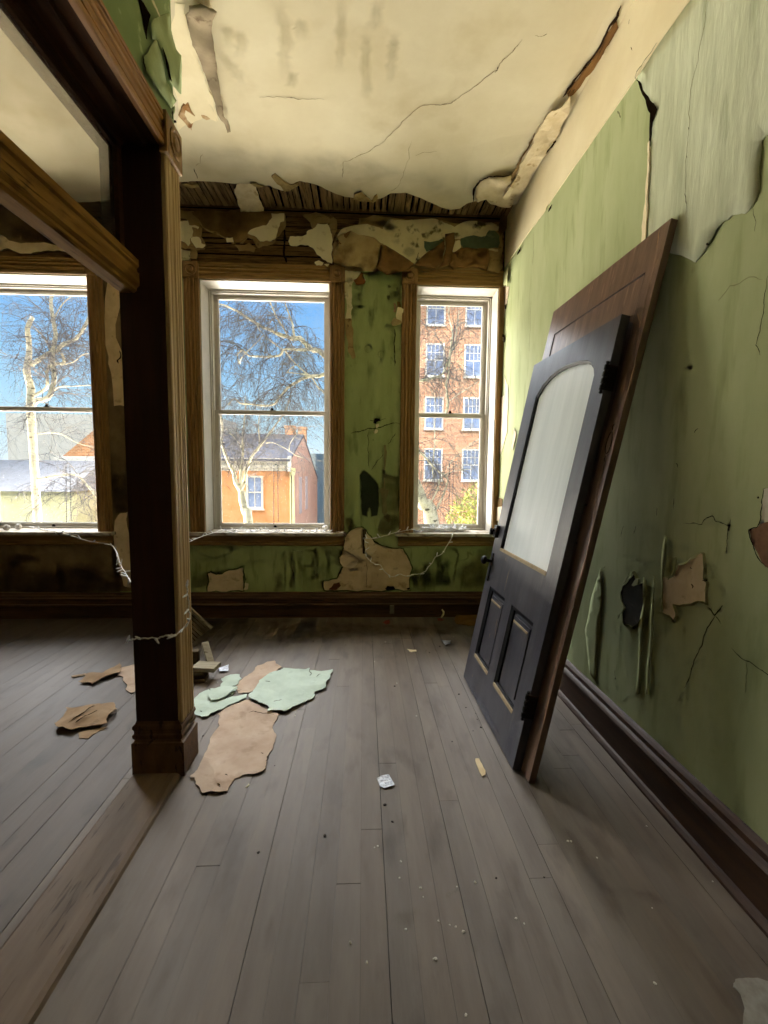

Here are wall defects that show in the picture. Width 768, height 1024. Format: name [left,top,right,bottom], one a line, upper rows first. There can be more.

peeling [171,0,231,133]
crack [342,34,546,191]
peeling [638,0,768,262]
flaking render [179,6,621,359]
peeling [498,376,516,466]
peeling [206,565,249,592]
flaking render [322,526,413,592]
water stain [360,470,379,517]
peeling [622,536,709,694]
crack [686,605,723,684]
crack [686,516,730,554]
flaking render [748,488,768,568]